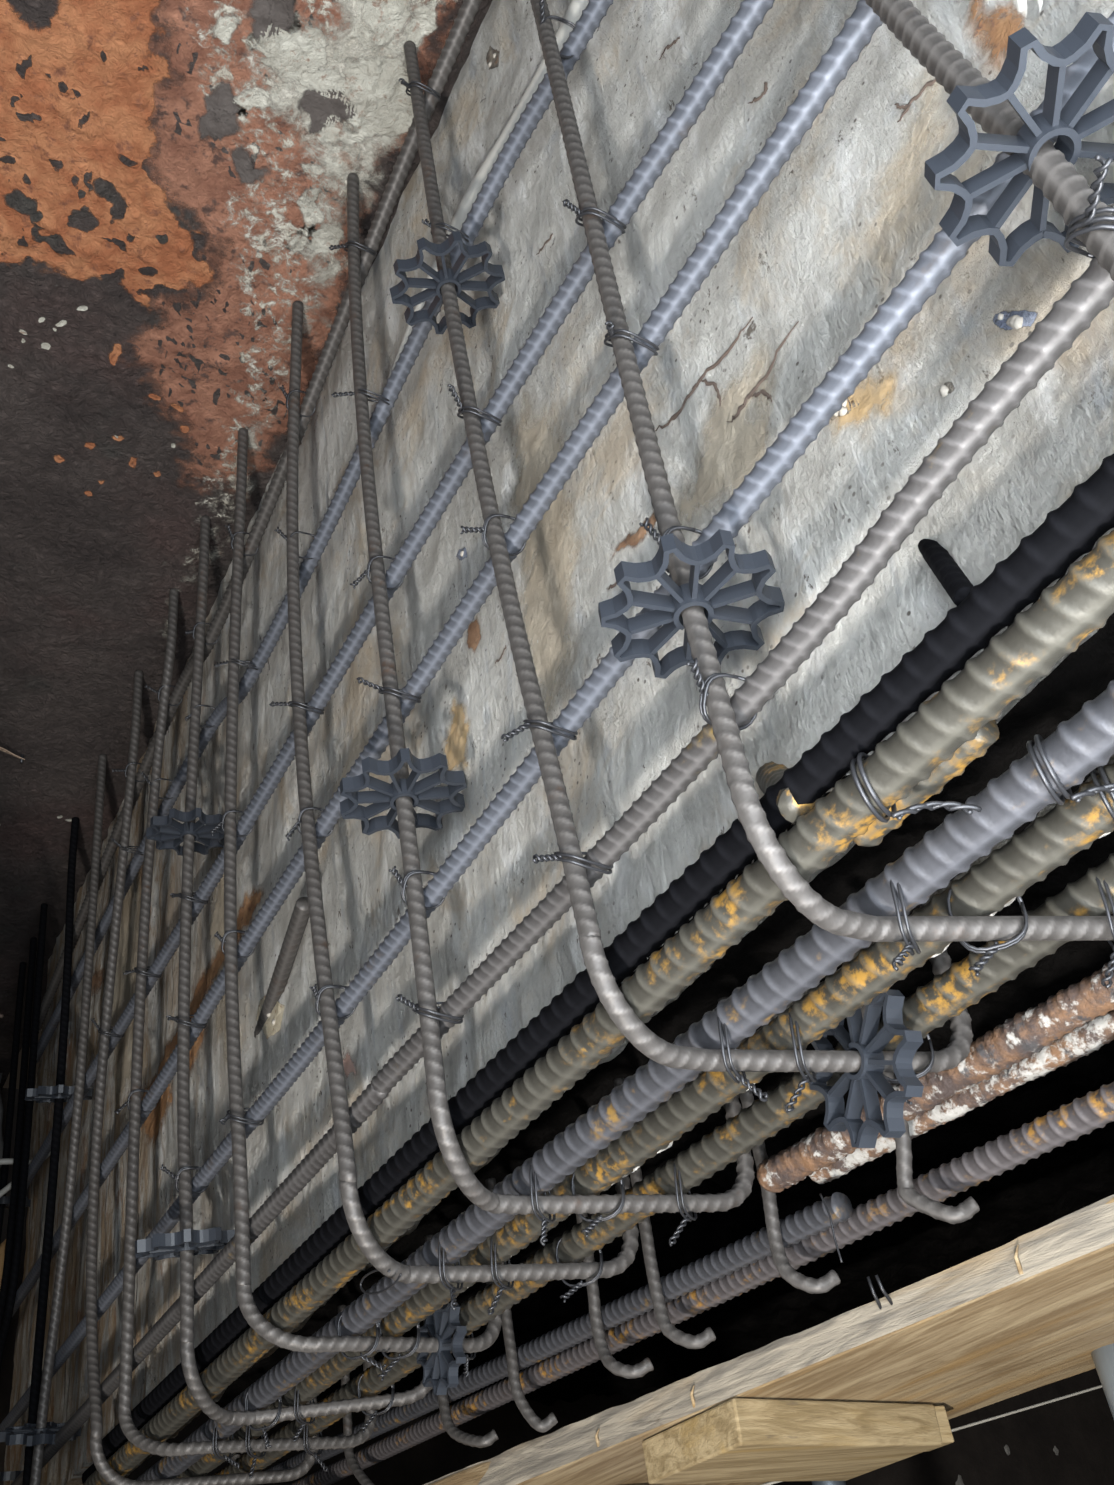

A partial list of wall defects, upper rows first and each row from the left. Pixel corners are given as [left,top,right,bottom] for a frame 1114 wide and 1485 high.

spalling [632,0,883,373]
crack [655,317,799,431]
spalling [0,0,788,1317]